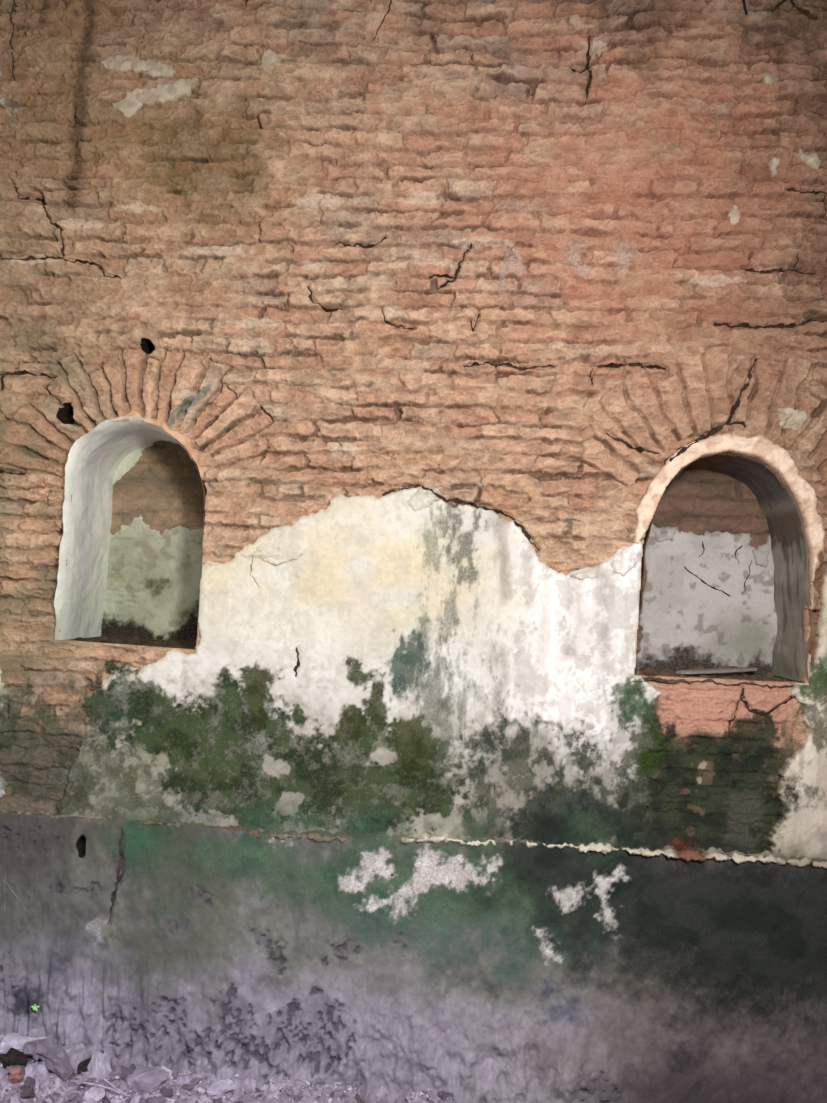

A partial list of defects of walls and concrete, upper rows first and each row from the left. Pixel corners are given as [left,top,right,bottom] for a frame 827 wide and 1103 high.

crack [0,189,121,278]
crack [714,319,827,329]
crack [606,358,758,462]
flaking render [113,441,157,485]
leakage [239,665,273,730]
leakage [335,658,439,779]
flaking render [58,486,777,841]
crack [728,688,796,736]
leakage [459,678,668,848]
flaking render [596,832,651,850]
leakage [338,844,502,919]
leakage [554,866,629,927]